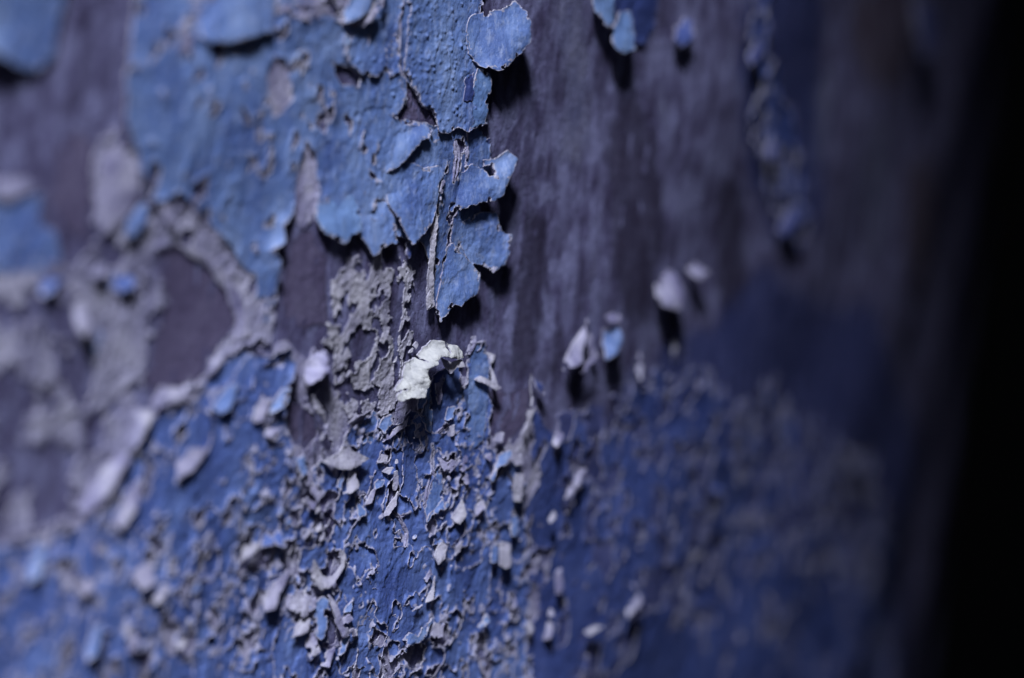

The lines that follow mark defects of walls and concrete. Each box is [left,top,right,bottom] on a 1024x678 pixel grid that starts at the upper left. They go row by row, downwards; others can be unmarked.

peeling [0,0,532,337]
peeling [0,243,894,678]